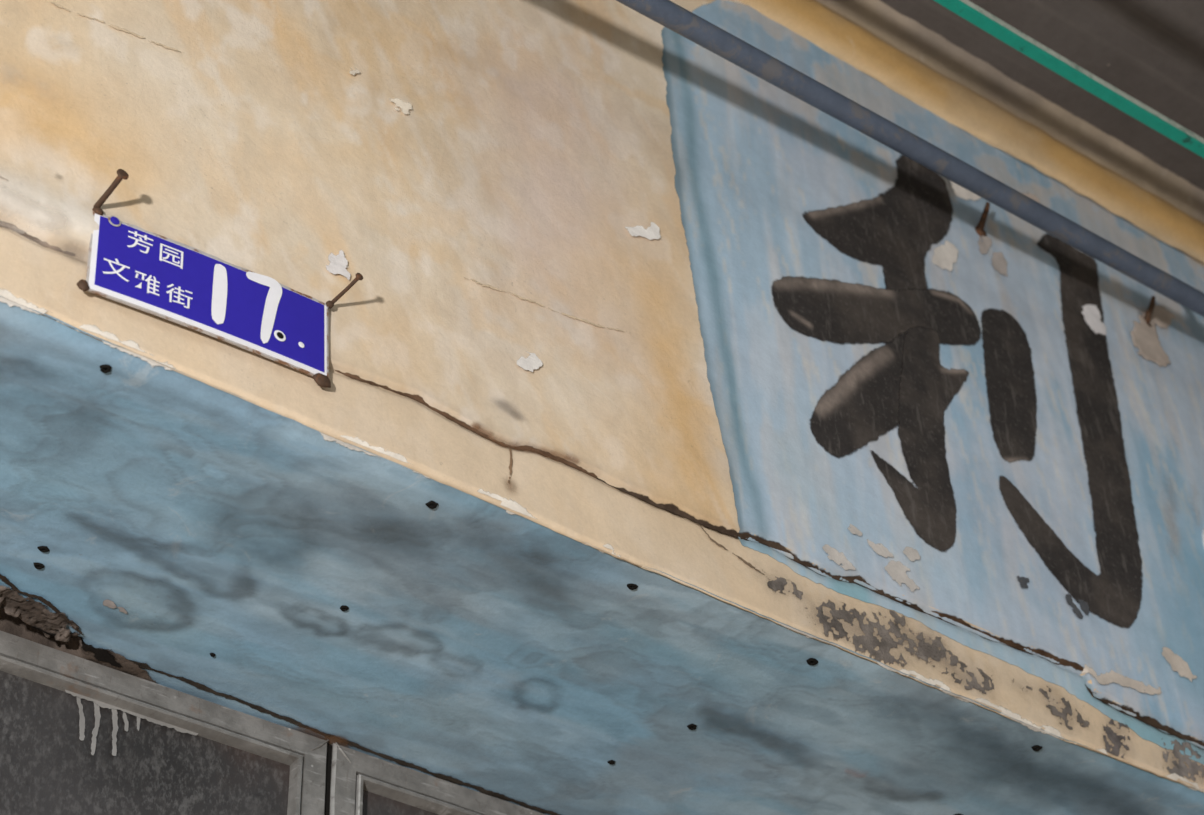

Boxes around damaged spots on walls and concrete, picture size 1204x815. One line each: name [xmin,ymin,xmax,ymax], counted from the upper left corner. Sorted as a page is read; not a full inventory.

peeling [950,181,981,201]
crack [0,221,75,256]
peeling [326,251,350,280]
peeling [625,222,661,240]
peeling [932,241,959,271]
peeling [1130,304,1176,367]
crack [335,370,1204,748]
spalling [0,574,156,683]
peeling [762,570,1146,769]
peeling [1162,647,1197,682]
damp [65,690,198,756]
peeling [1163,739,1204,792]